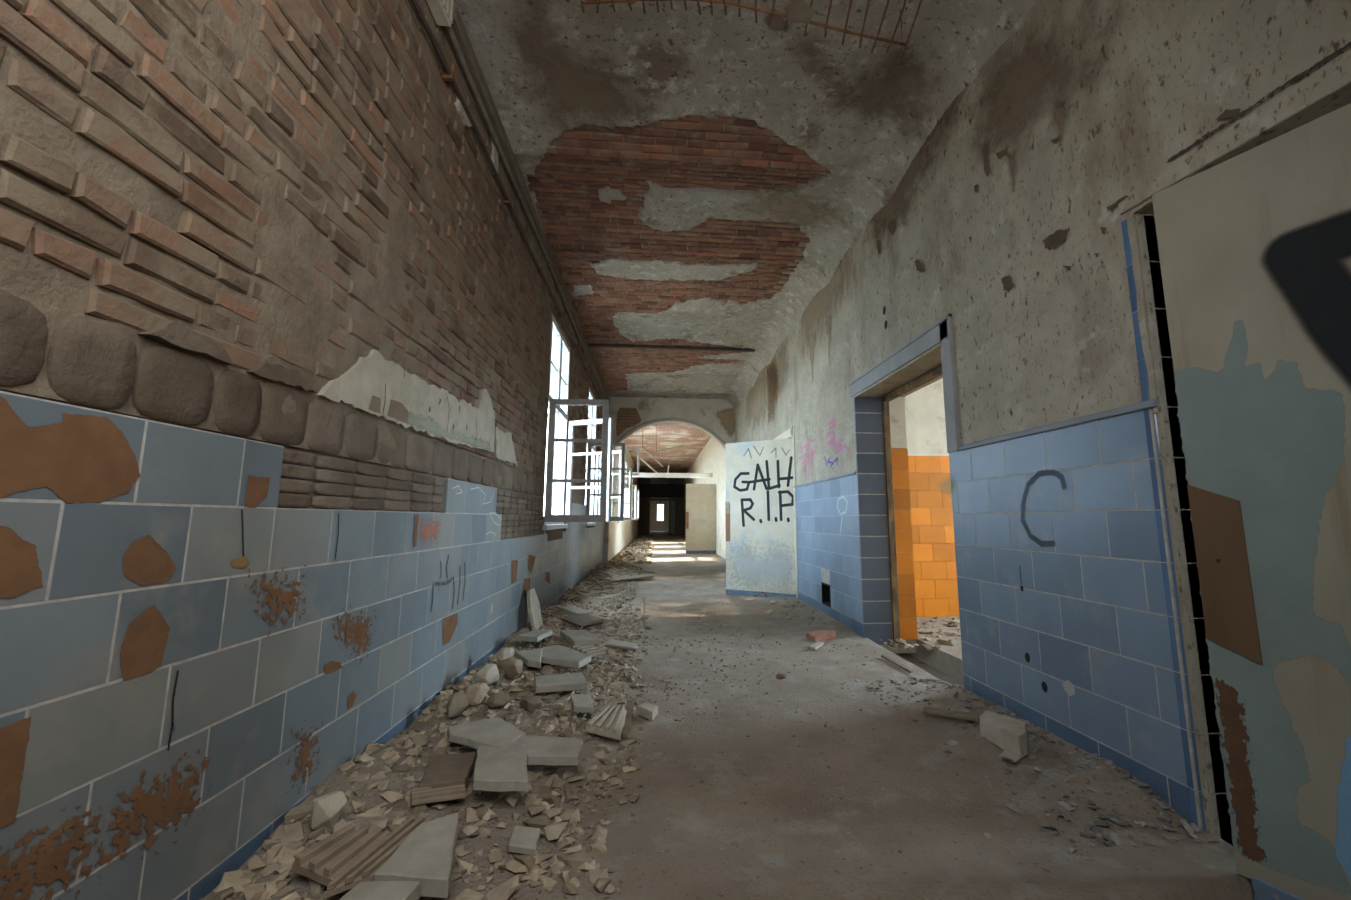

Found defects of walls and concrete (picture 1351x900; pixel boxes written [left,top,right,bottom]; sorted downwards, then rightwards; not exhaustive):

crack [1167,42,1351,162]
spalling [0,0,831,542]
peeling [1214,678,1267,863]